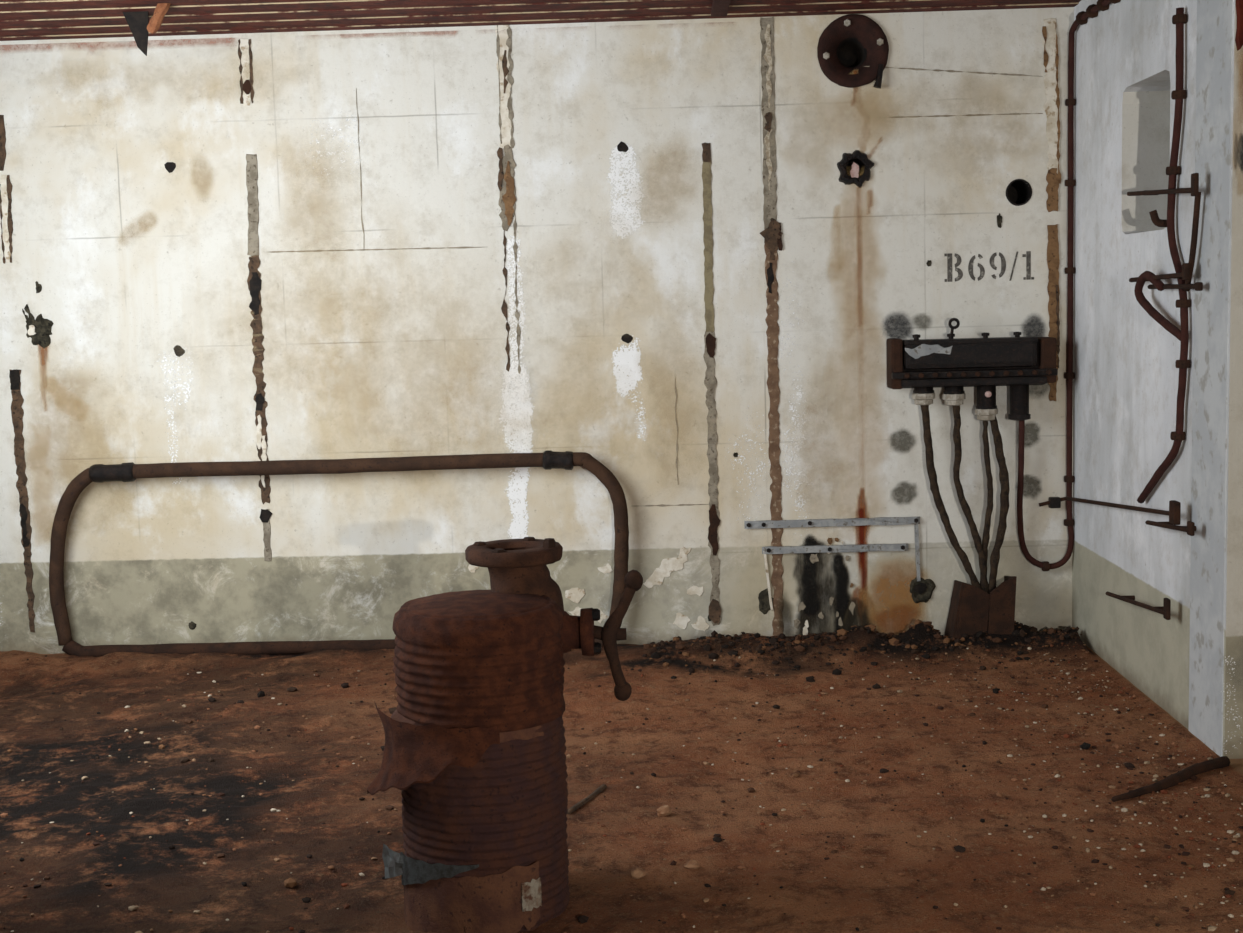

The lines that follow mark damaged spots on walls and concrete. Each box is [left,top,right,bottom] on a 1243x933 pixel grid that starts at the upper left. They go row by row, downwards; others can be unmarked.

leakage [607,142,646,240]
spalling [22,304,54,379]
leakage [499,236,535,539]
leakage [611,335,648,441]
corrosion [852,489,883,633]